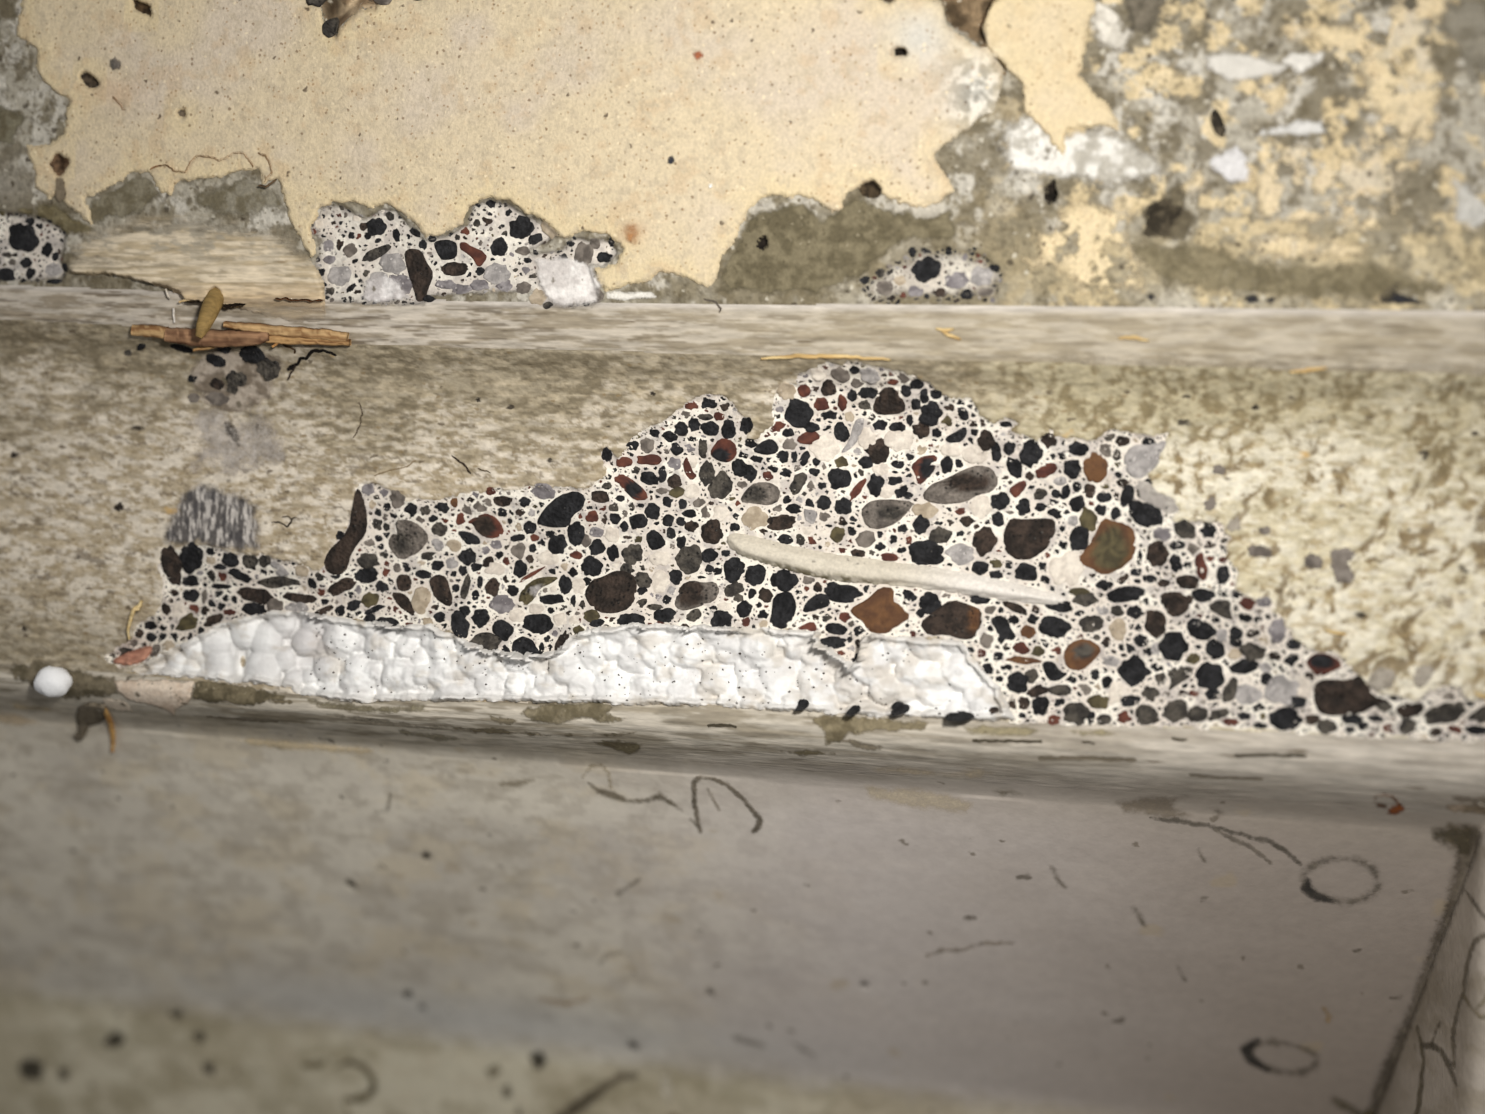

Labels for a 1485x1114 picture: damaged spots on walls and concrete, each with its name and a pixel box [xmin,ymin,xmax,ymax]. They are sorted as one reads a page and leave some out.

flaking render [17,0,1119,309]
spalling [1211,109,1226,137]
flaking render [1252,0,1446,259]
spalling [0,211,68,284]
flaking render [1029,171,1204,293]
spalling [170,344,282,412]
spalling [103,361,1485,743]
leakage [967,725,1037,736]
crack [1414,893,1485,1114]